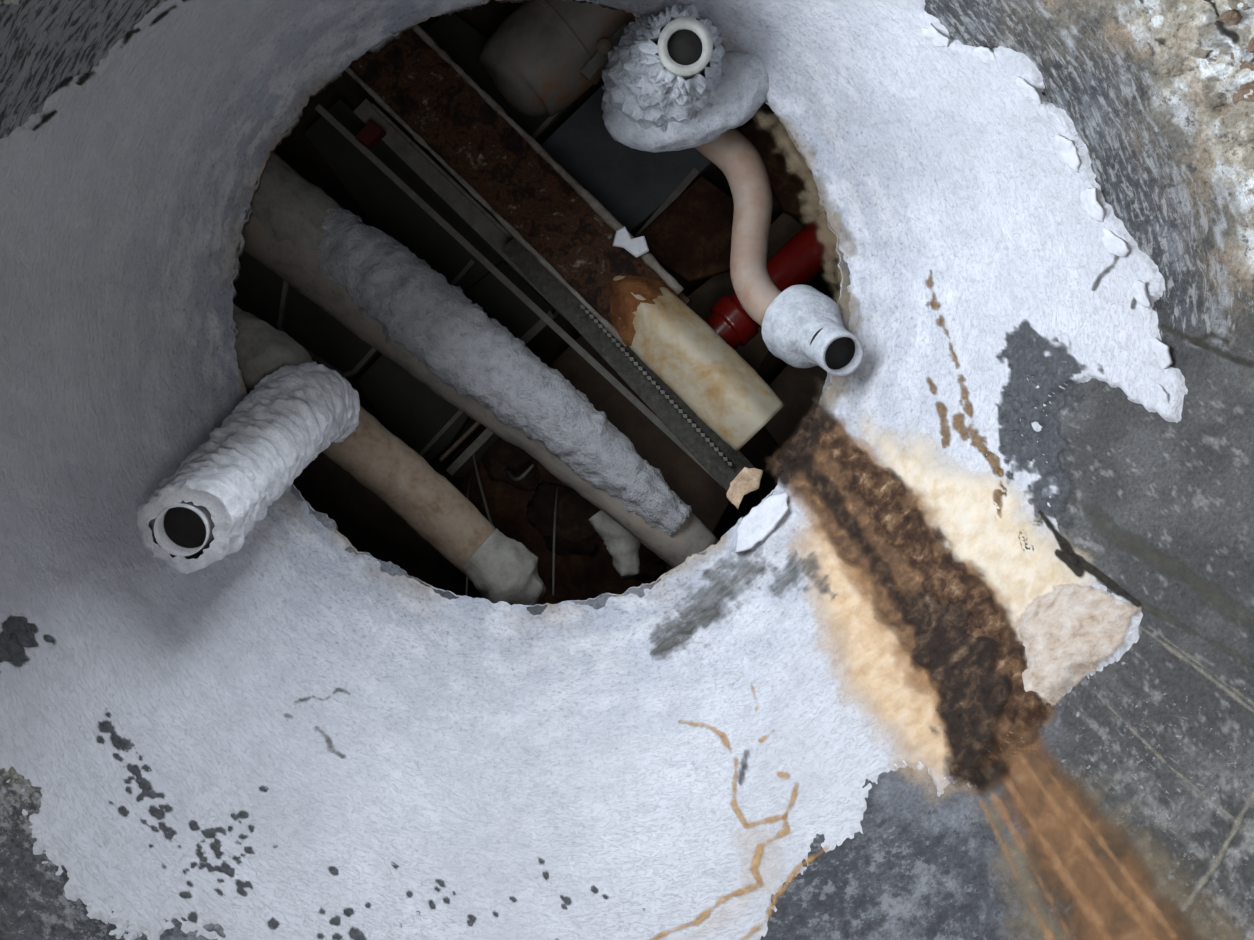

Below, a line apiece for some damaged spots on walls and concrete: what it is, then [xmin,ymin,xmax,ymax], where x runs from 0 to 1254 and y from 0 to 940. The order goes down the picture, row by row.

peeling [974,45,998,64]
flaking render [1204,0,1254,169]
peeling [1080,188,1130,257]
peeling [1149,337,1173,369]
peeling [984,321,1084,529]
peeling [0,616,55,667]
corrosion [769,270,1238,940]
crack [1038,510,1254,712]
peeling [97,708,255,922]
peeling [318,903,371,940]
peeling [417,879,455,914]
crack [1181,791,1254,911]